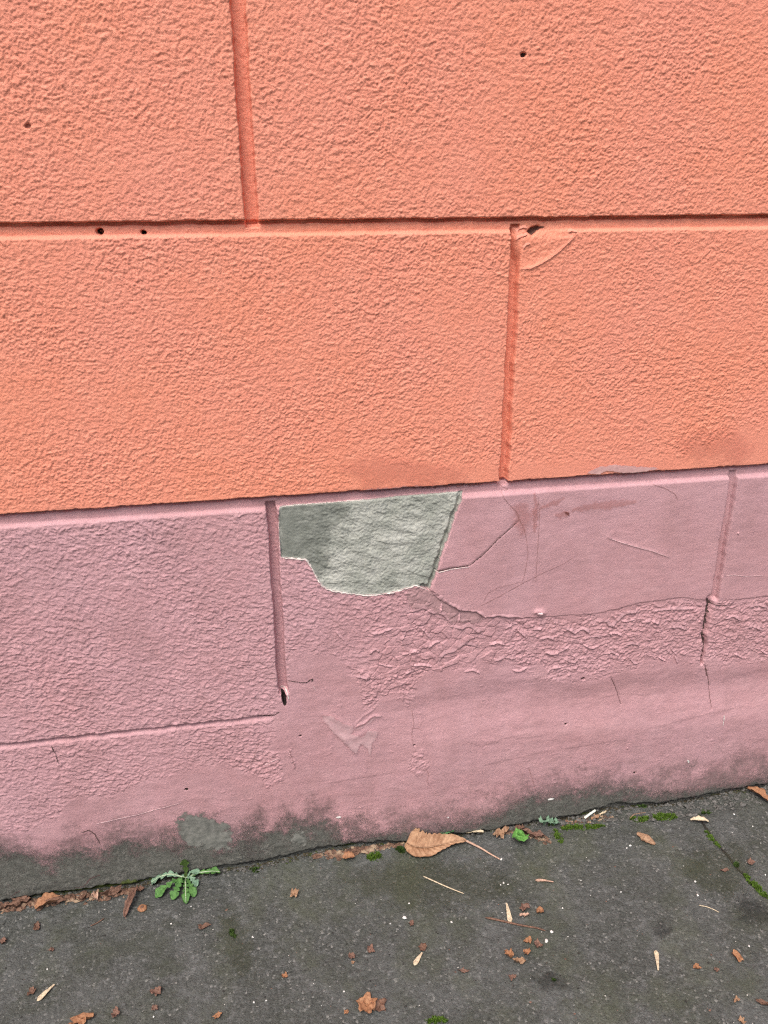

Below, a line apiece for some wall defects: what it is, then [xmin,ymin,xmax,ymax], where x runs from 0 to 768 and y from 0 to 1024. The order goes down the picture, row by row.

flaking render [515,225,544,250]
flaking render [279,490,697,675]
crack [435,482,572,604]
crack [700,598,731,708]
water stain [212,756,768,861]